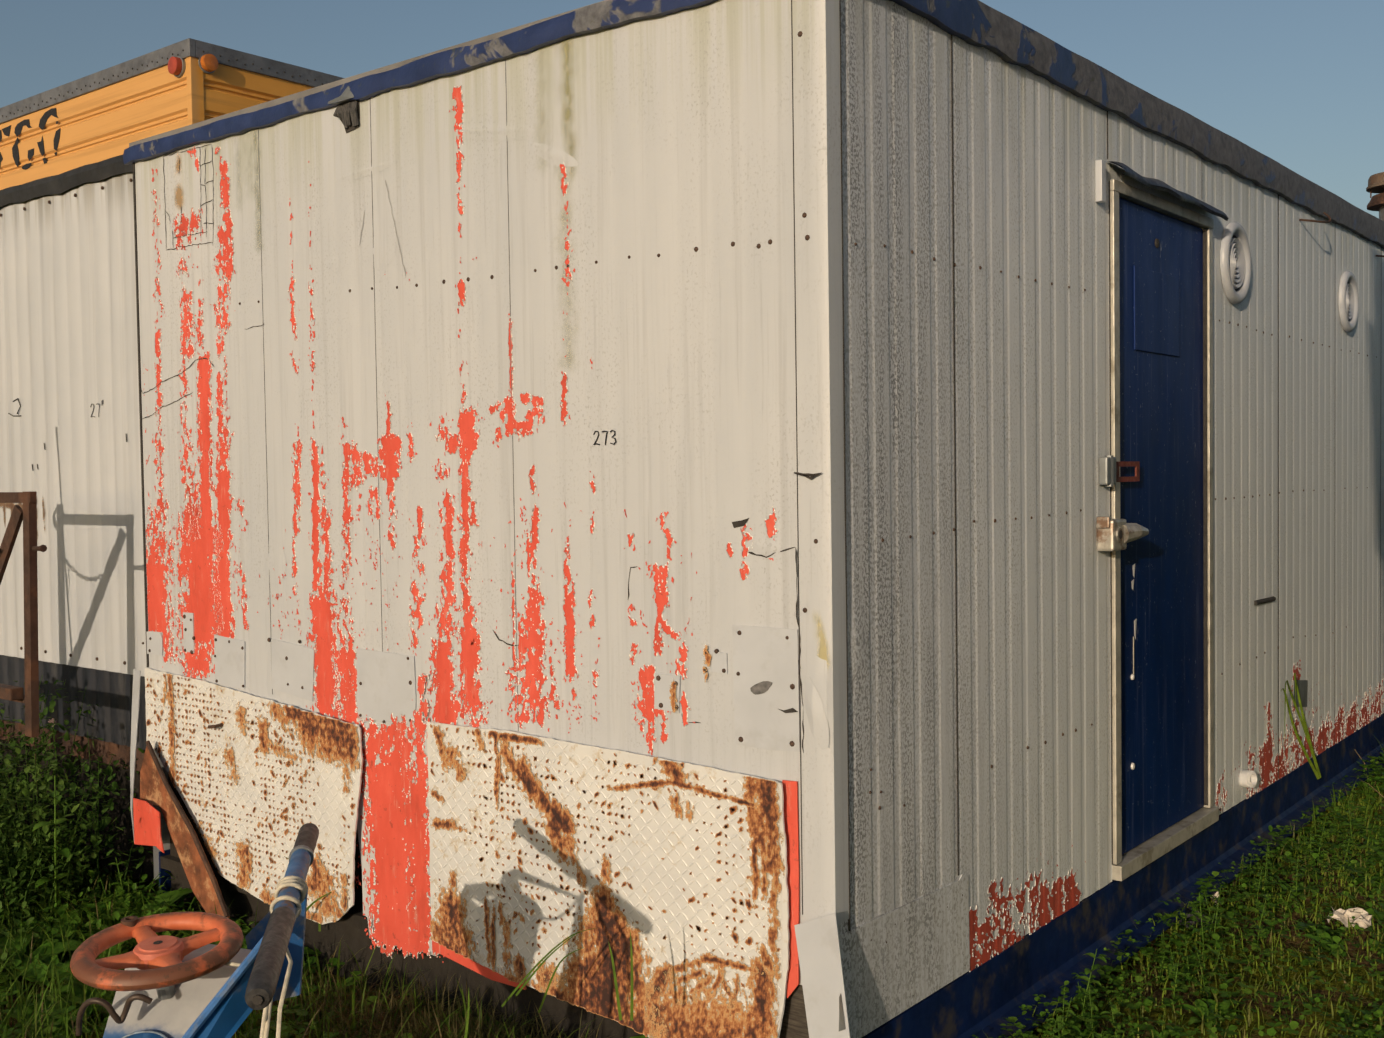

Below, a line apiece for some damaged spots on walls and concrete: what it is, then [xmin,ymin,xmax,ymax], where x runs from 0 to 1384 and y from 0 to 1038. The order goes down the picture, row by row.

peeling [449,85,465,238]
corrosion [145,673,359,924]
peeling [143,146,600,959]
corrosion [430,724,785,1038]
peeling [624,509,697,756]
peeling [726,506,779,581]
peeling [969,860,1086,972]
peeling [1215,660,1384,812]